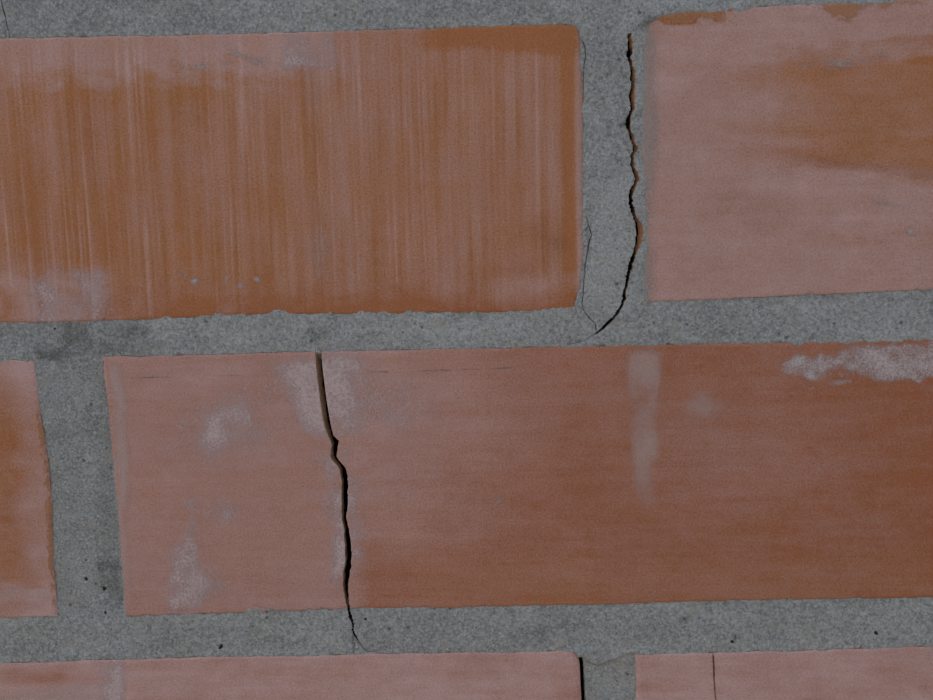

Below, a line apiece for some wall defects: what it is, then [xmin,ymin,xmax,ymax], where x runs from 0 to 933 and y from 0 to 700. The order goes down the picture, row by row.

crack [573,33,644,344]
crack [315,349,381,652]
efflorescence [784,342,933,382]